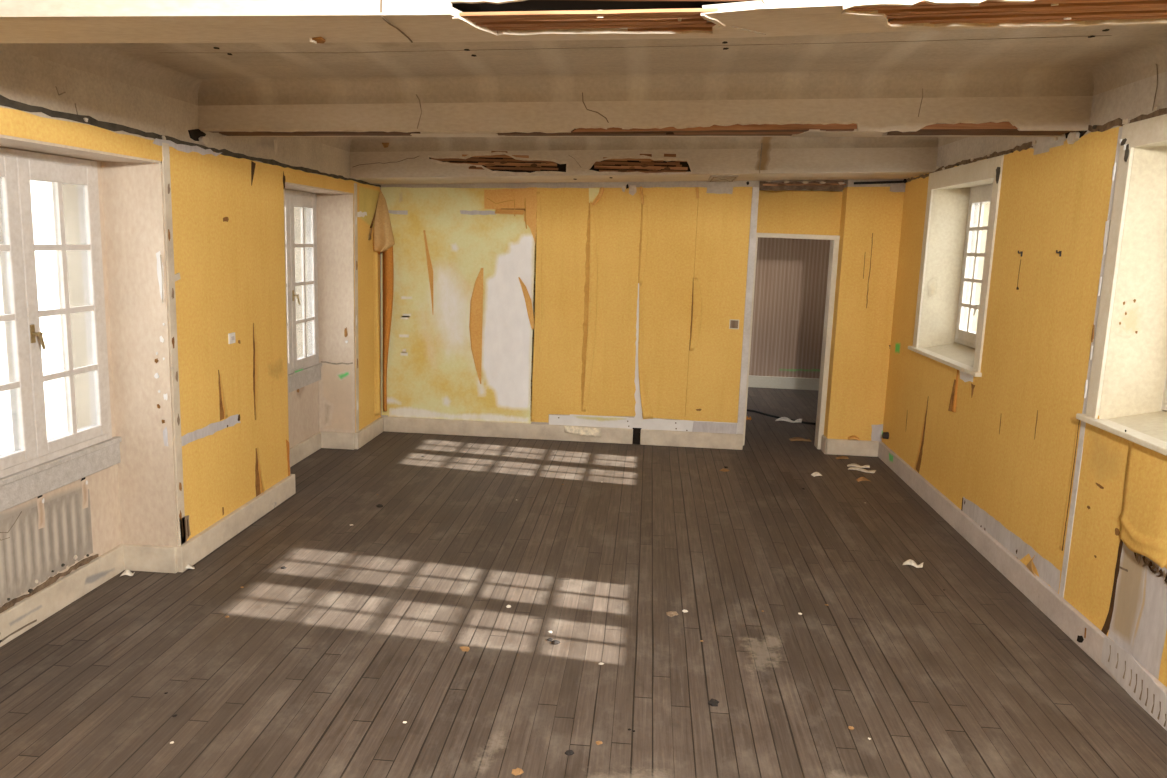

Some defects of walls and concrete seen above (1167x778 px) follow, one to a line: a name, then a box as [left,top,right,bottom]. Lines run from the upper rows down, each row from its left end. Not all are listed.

crack [380,0,413,43]
spalling [450,0,769,37]
spalling [841,0,1167,29]
spalling [0,95,1167,187]
spalling [759,180,846,191]
peeling [1103,220,1111,254]
flaking render [961,497,1060,593]
flaking render [1101,539,1167,731]